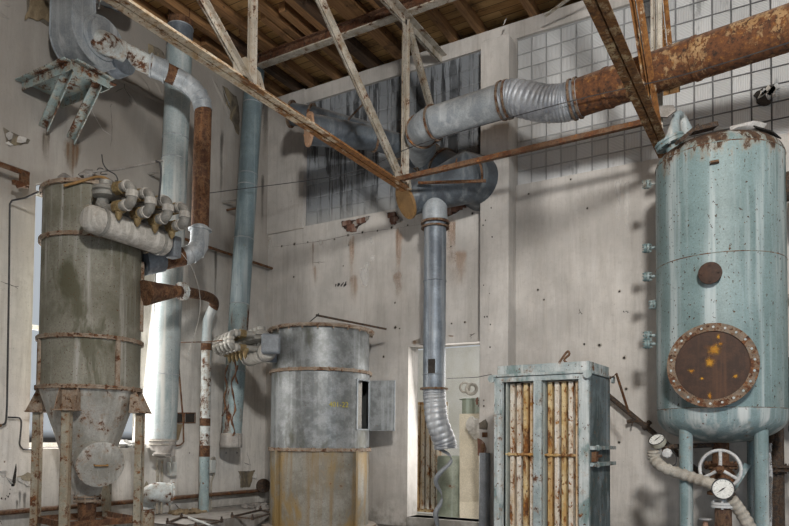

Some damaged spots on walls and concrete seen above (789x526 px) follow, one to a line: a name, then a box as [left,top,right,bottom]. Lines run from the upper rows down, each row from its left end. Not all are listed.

spalling [341,215,371,246]
spalling [386,212,409,230]